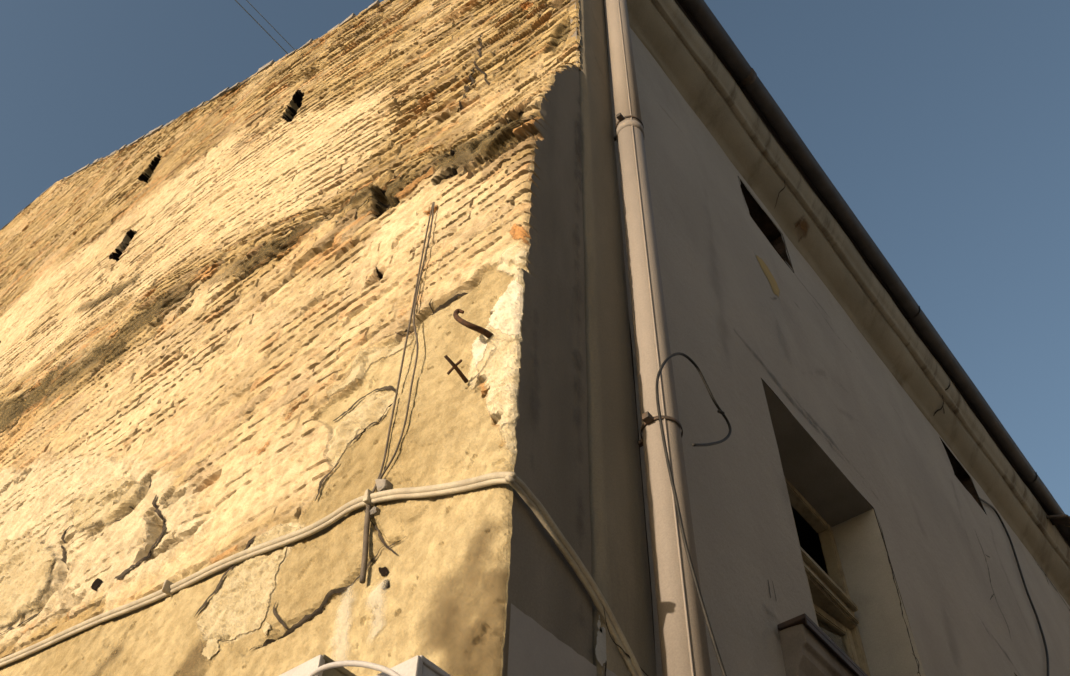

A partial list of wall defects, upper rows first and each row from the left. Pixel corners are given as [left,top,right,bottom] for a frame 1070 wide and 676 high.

spalling [469,224,531,464]
spalling [327,390,396,467]
spalling [196,524,301,659]
crack [249,510,402,651]
crack [879,523,921,676]